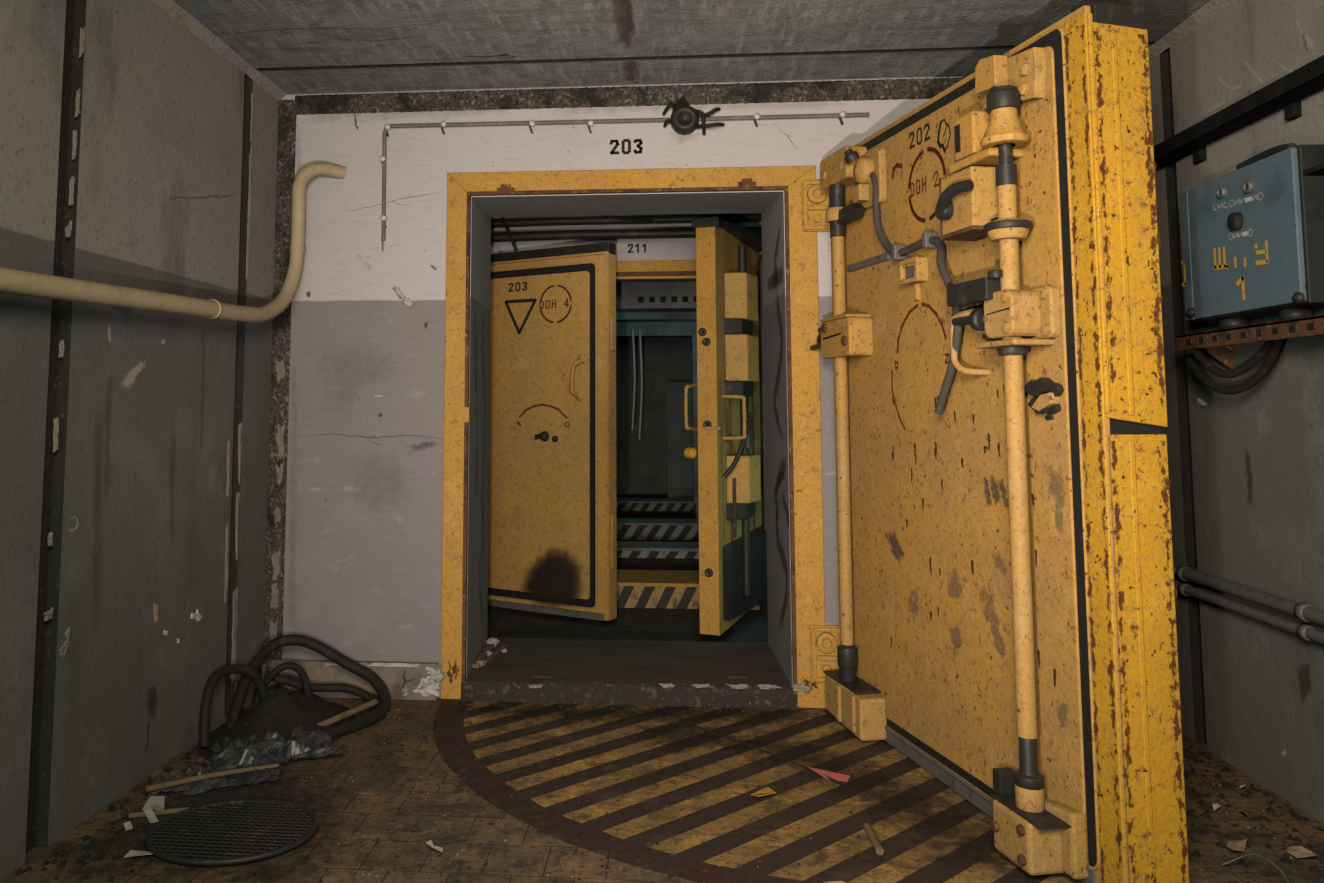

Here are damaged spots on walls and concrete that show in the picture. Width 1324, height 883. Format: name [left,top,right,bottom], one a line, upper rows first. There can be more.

corrosion [1138,34,1166,406]
spalling [276,358,286,382]
spalling [275,424,285,485]
corrosion [1063,25,1135,883]
spalling [269,546,281,641]
spalling [360,662,446,697]
corrosion [1157,441,1192,883]